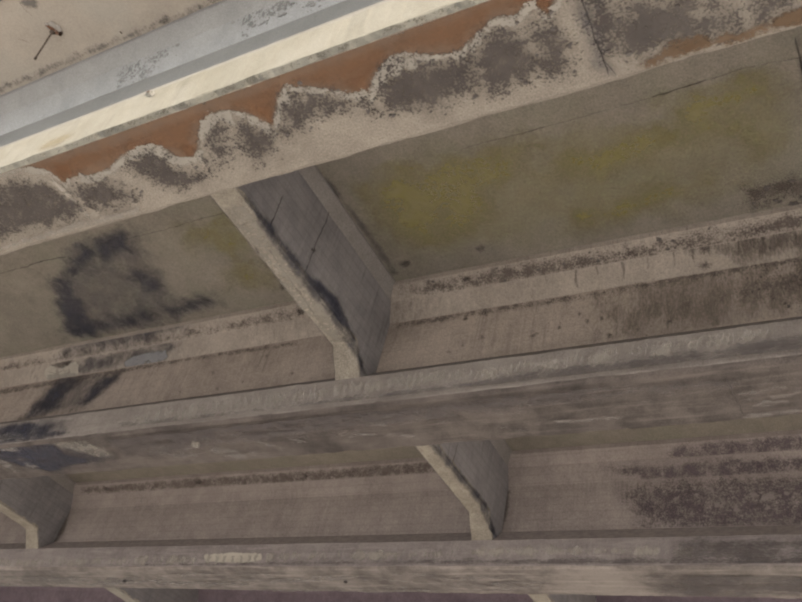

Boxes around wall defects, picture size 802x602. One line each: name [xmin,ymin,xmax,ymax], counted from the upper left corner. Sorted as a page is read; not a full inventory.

peeling [231,0,325,37]
crack [581,0,616,75]
crack [650,80,706,98]
water stain [1,233,305,370]
water stain [455,331,802,388]
water stain [0,375,604,471]
water stain [81,462,435,494]
water stain [431,444,496,536]
water stain [613,436,802,528]
water stain [0,552,364,592]
water stain [307,539,802,564]